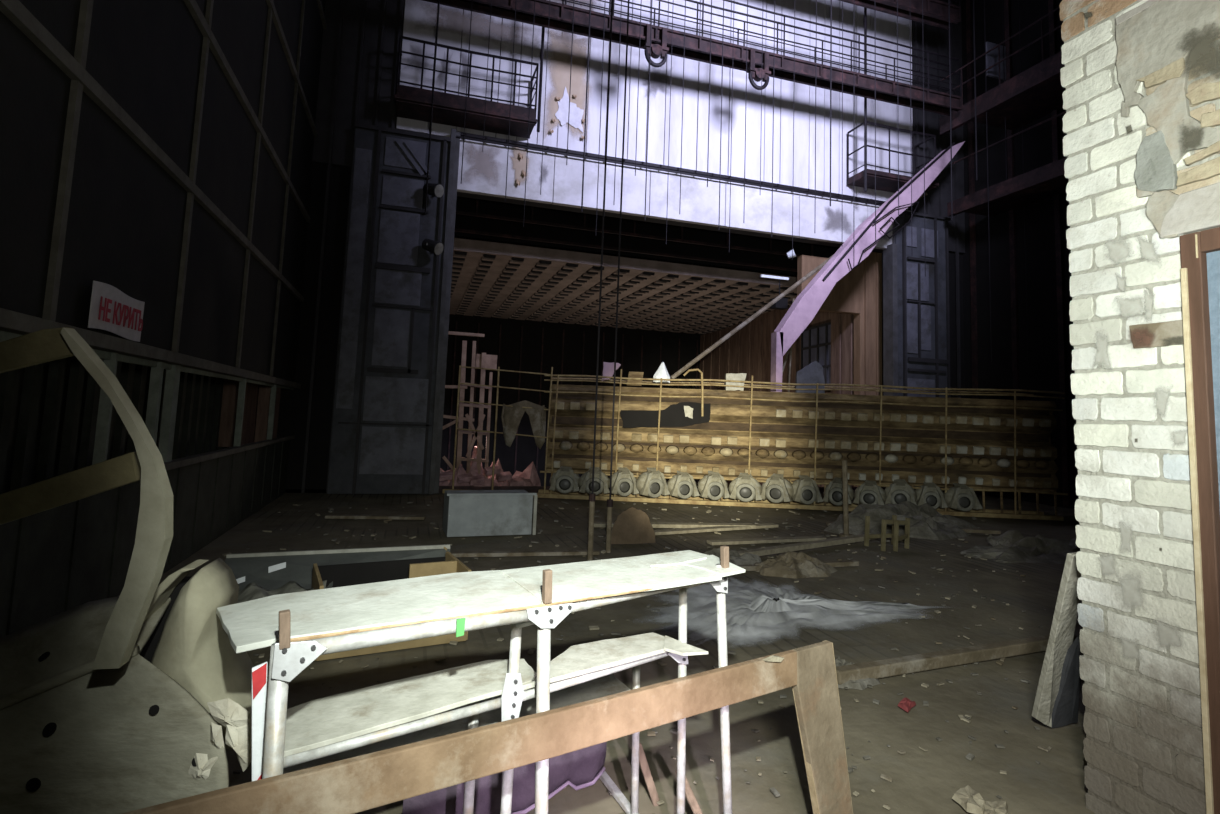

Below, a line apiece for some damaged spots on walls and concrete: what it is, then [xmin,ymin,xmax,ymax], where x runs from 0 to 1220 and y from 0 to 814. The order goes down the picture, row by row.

peeling [468,147,497,179]
peeling [511,147,529,186]
peeling [548,38,587,139]
flaking render [1115,0,1220,239]